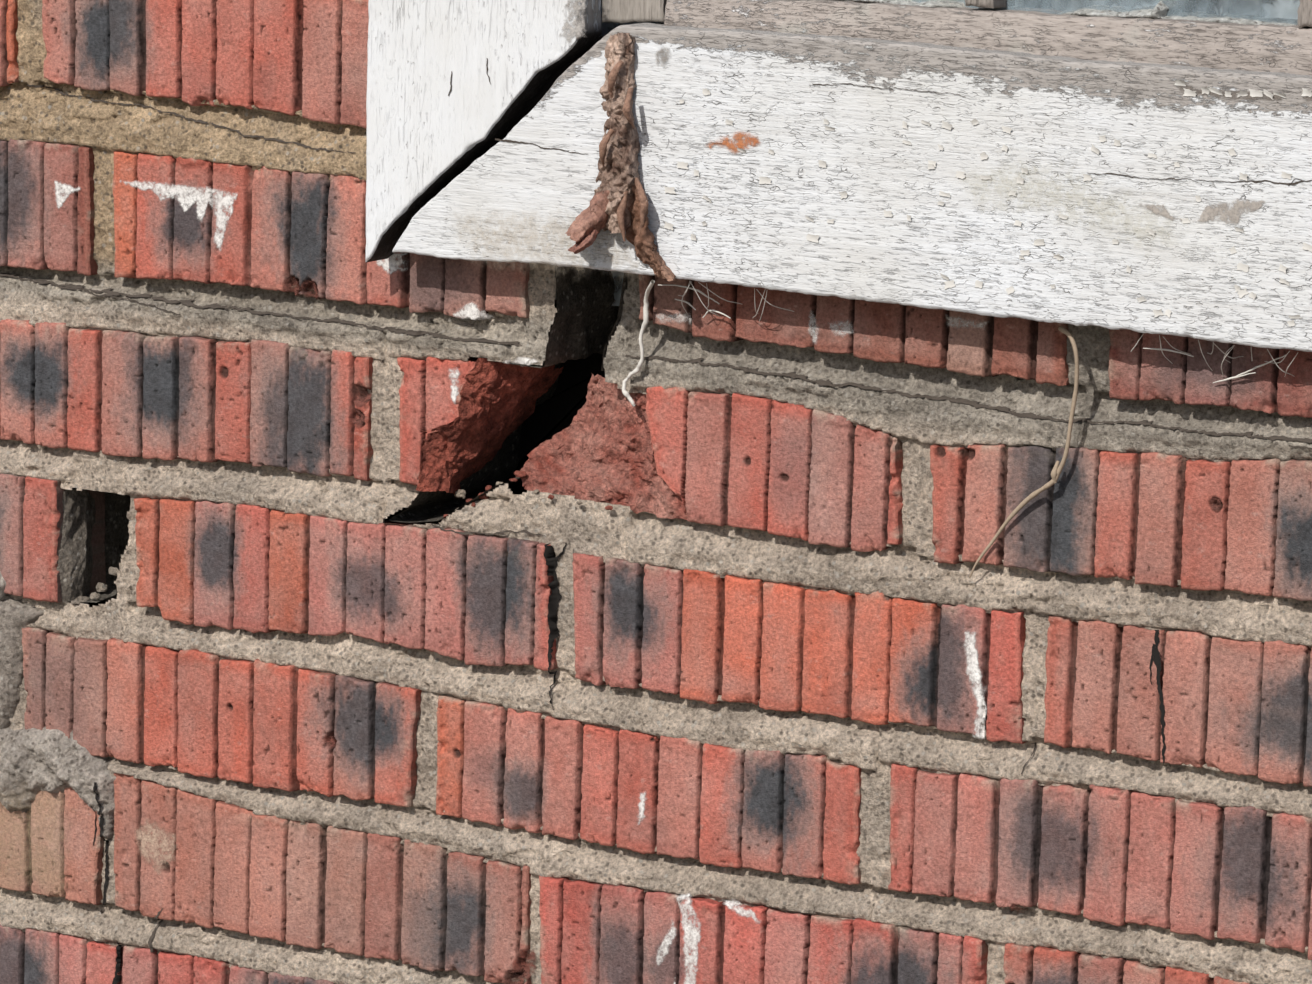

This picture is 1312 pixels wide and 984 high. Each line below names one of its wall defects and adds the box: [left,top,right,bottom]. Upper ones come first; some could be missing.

peeling [1175,79,1312,100]
peeling [1140,195,1264,300]
spalling [416,358,564,495]
spalling [520,373,687,520]
crack [0,265,1312,710]
crack [112,908,164,984]